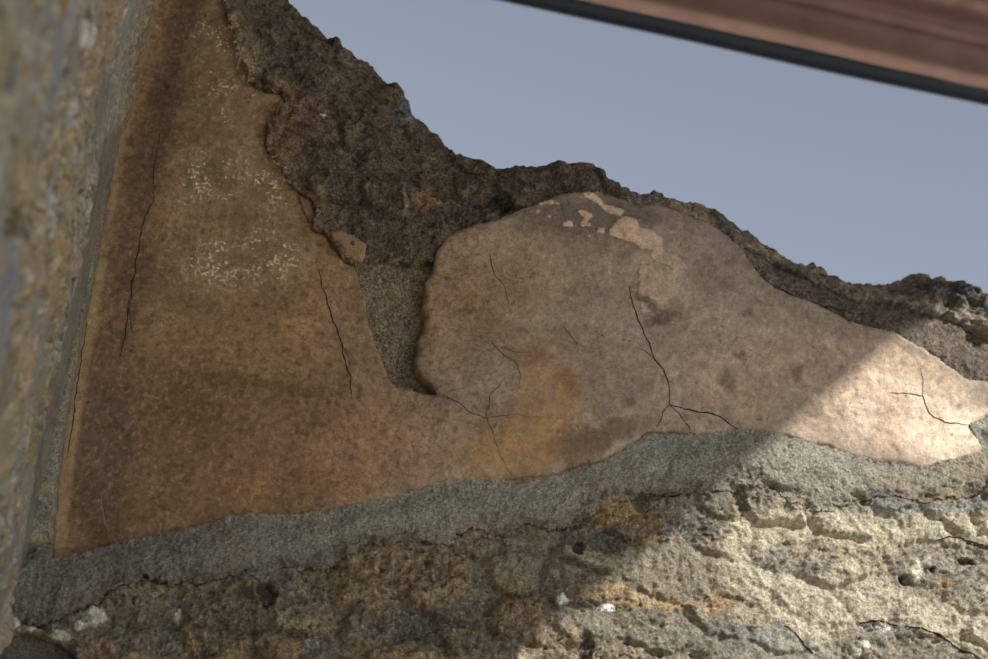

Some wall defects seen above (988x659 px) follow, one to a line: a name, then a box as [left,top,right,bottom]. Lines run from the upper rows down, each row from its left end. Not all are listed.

spalling [222,0,687,395]
crack [318,269,352,394]
crack [629,285,738,434]
spalling [744,248,988,383]
crack [891,368,971,426]
crack [937,536,988,550]
crack [859,620,981,659]